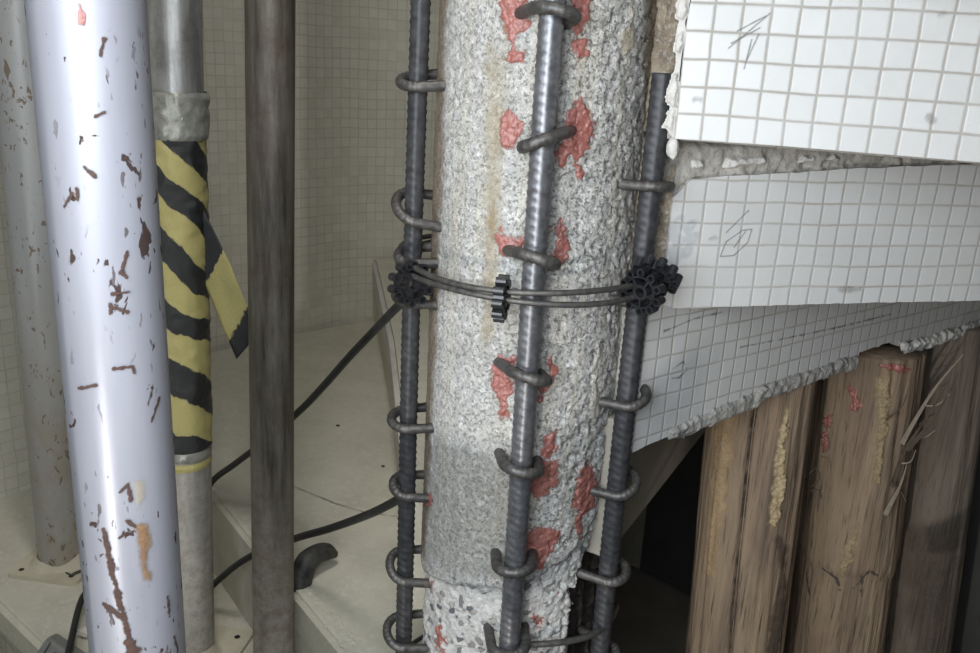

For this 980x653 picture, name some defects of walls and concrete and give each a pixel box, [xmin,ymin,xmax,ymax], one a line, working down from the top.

spalling [673,0,690,55]
spalling [662,71,680,133]
spalling [663,141,963,191]
spalling [898,320,980,354]
spalling [667,355,859,440]
leakage [530,429,559,500]
leakage [570,460,598,540]
leakage [525,527,561,570]